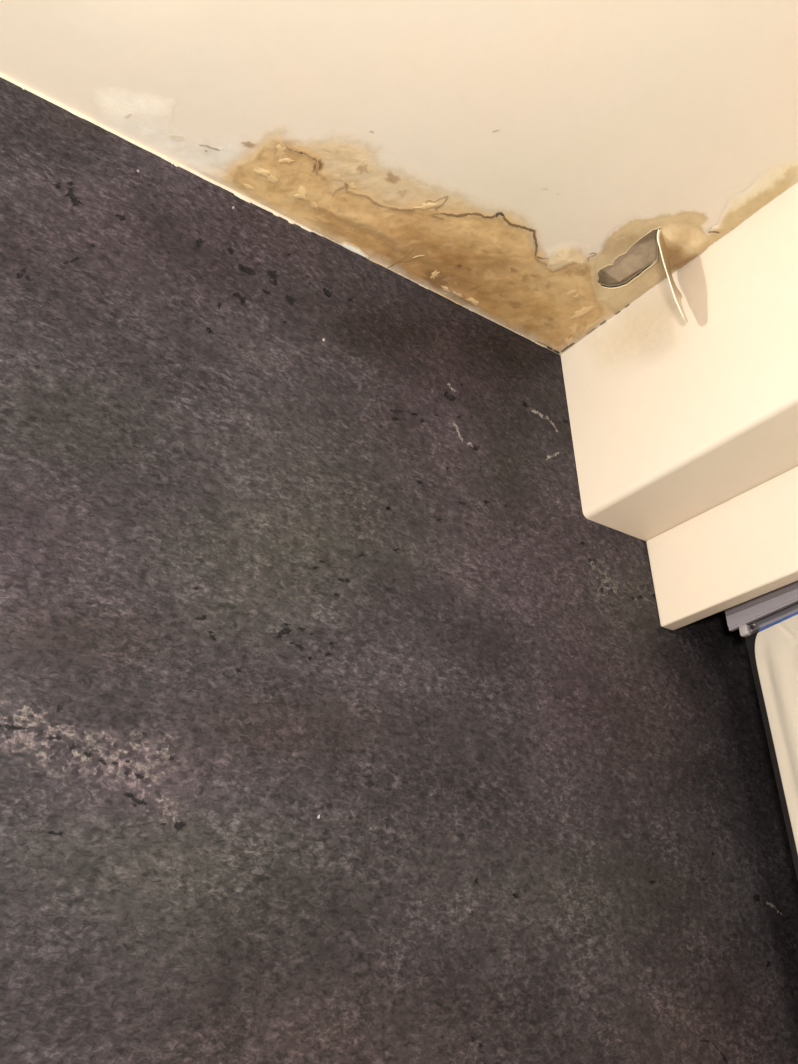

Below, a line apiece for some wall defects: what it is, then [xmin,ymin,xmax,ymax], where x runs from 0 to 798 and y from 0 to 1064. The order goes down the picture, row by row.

peeling [338,241,392,270]
damp [96,108,798,381]
peeling [597,227,688,323]